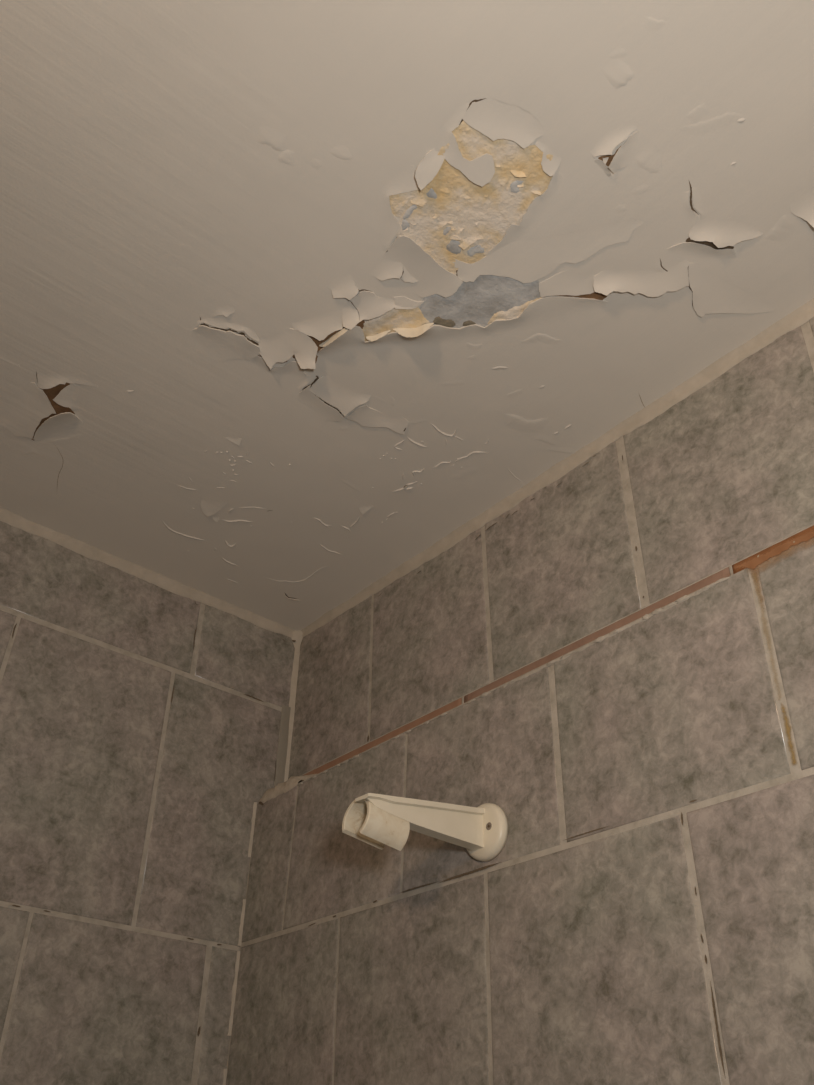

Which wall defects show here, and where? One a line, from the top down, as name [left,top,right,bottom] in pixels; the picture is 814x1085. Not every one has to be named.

peeling [251,96,814,381]
peeling [0,372,98,446]